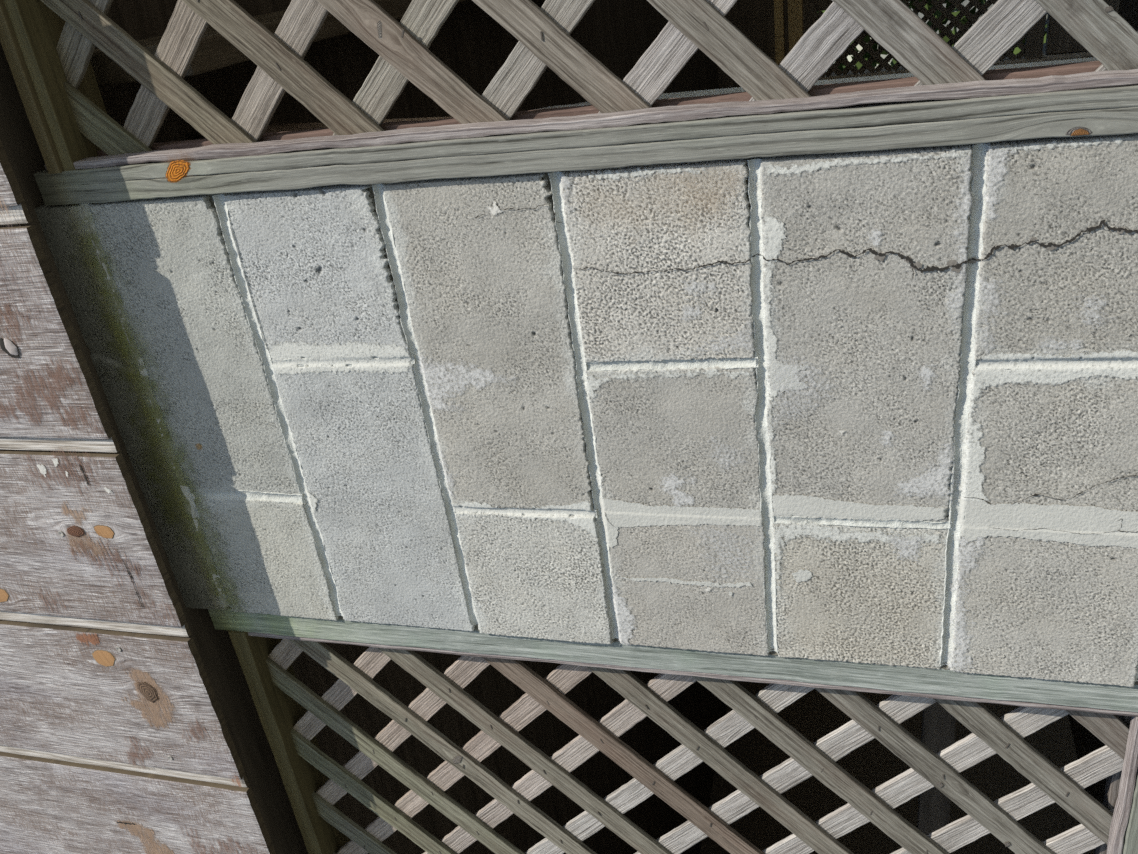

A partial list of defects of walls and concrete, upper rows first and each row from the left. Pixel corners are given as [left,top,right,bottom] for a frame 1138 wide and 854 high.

crack [580,220,1138,279]
crack [964,475,1138,534]